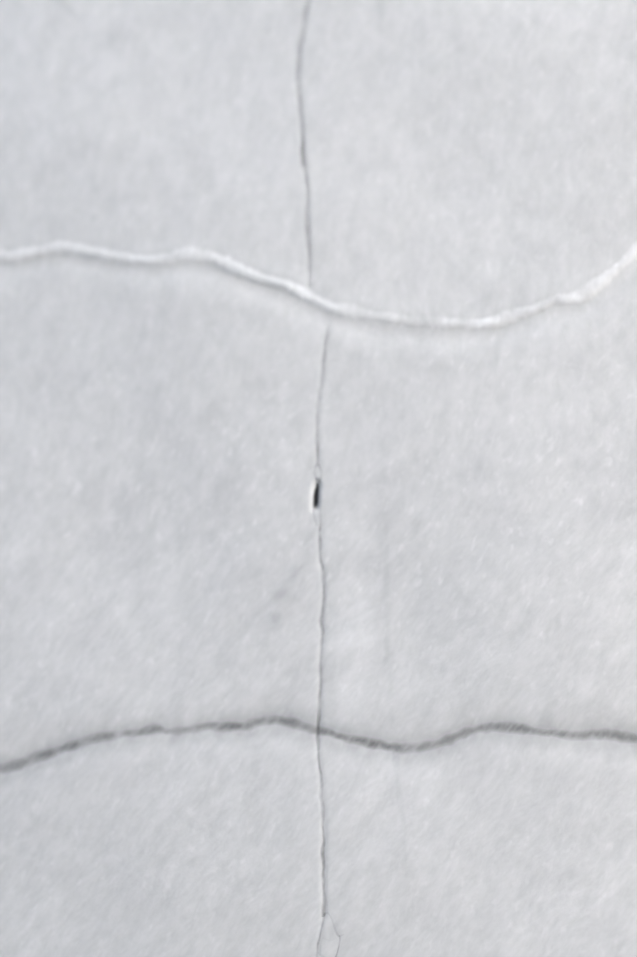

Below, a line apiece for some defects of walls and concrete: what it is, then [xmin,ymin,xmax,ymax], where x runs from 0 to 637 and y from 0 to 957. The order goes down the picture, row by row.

crack [321,934,336,957]